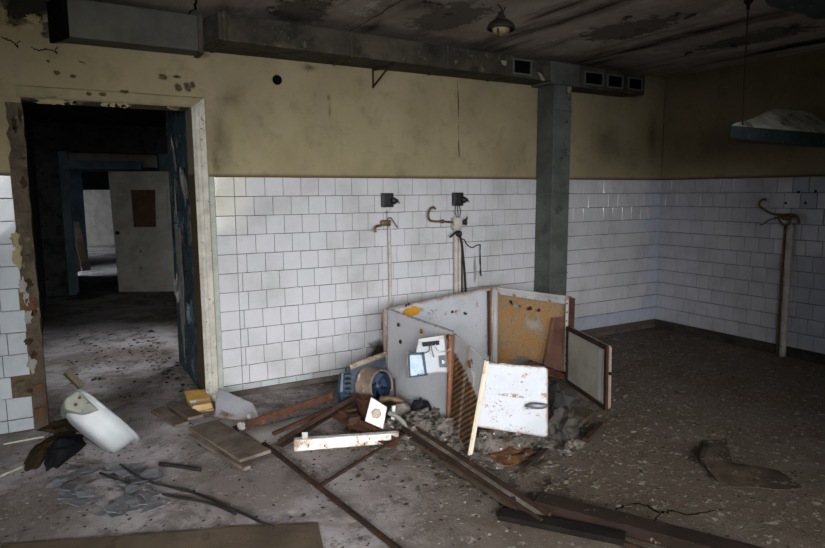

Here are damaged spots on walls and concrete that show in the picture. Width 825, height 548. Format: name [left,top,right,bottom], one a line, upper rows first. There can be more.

flaking render [159,74,195,91]
flaking render [4,95,86,430]
peeling [171,138,194,359]
crack [615,503,723,520]